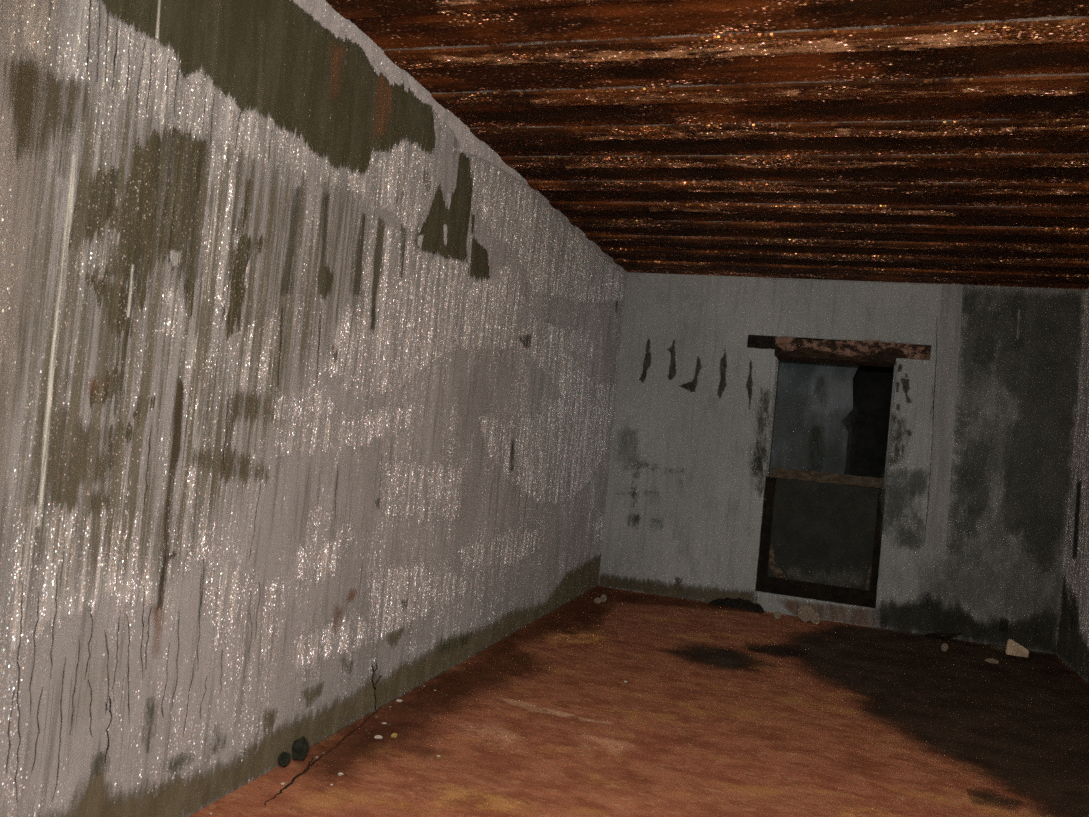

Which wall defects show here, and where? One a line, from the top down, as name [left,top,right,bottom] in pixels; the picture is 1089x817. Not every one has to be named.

peeling [97,0,436,174]
peeling [431,32,1046,65]
water stain [0,0,625,675]
peeling [416,152,489,283]
peeling [639,339,651,383]
peeling [667,340,702,392]
peeling [718,350,727,399]
water stain [764,277,940,285]
water stain [1072,481,1081,558]
crack [265,663,382,805]
water stain [52,515,757,817]
water stain [672,578,1089,817]